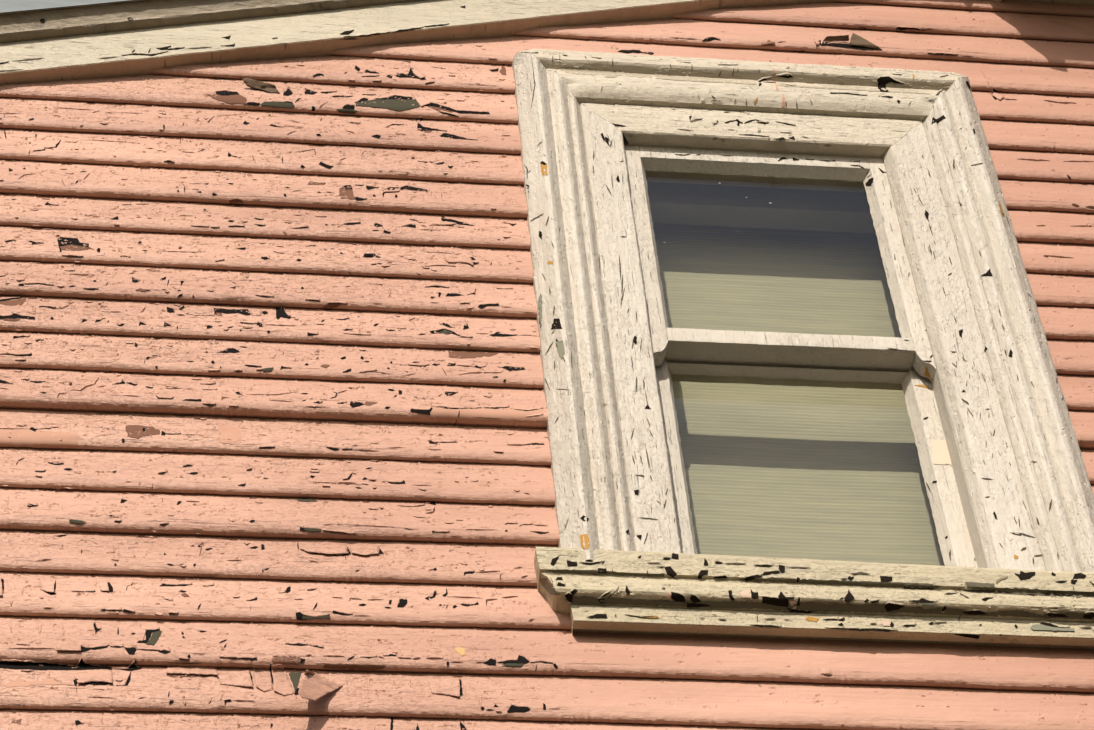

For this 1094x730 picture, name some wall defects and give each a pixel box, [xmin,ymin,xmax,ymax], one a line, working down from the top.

peeling [821,33,881,49]
peeling [206,65,484,137]
peeling [5,218,100,262]
peeling [122,414,181,442]
peeling [298,525,383,556]
peeling [540,555,606,595]
peeling [0,579,397,701]
peeling [1014,620,1075,631]
peeling [483,653,529,666]